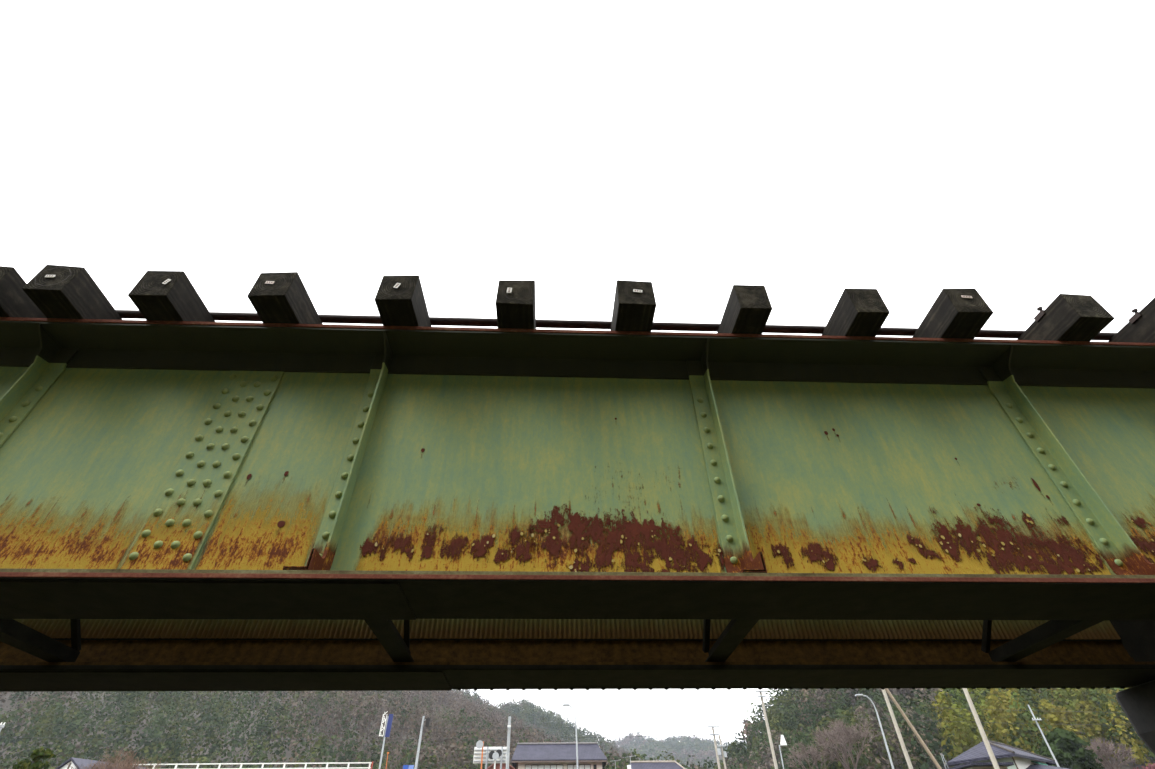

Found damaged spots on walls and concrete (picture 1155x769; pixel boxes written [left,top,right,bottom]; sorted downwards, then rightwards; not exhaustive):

corrosion [0,491,336,570]
corrosion [355,478,1155,575]